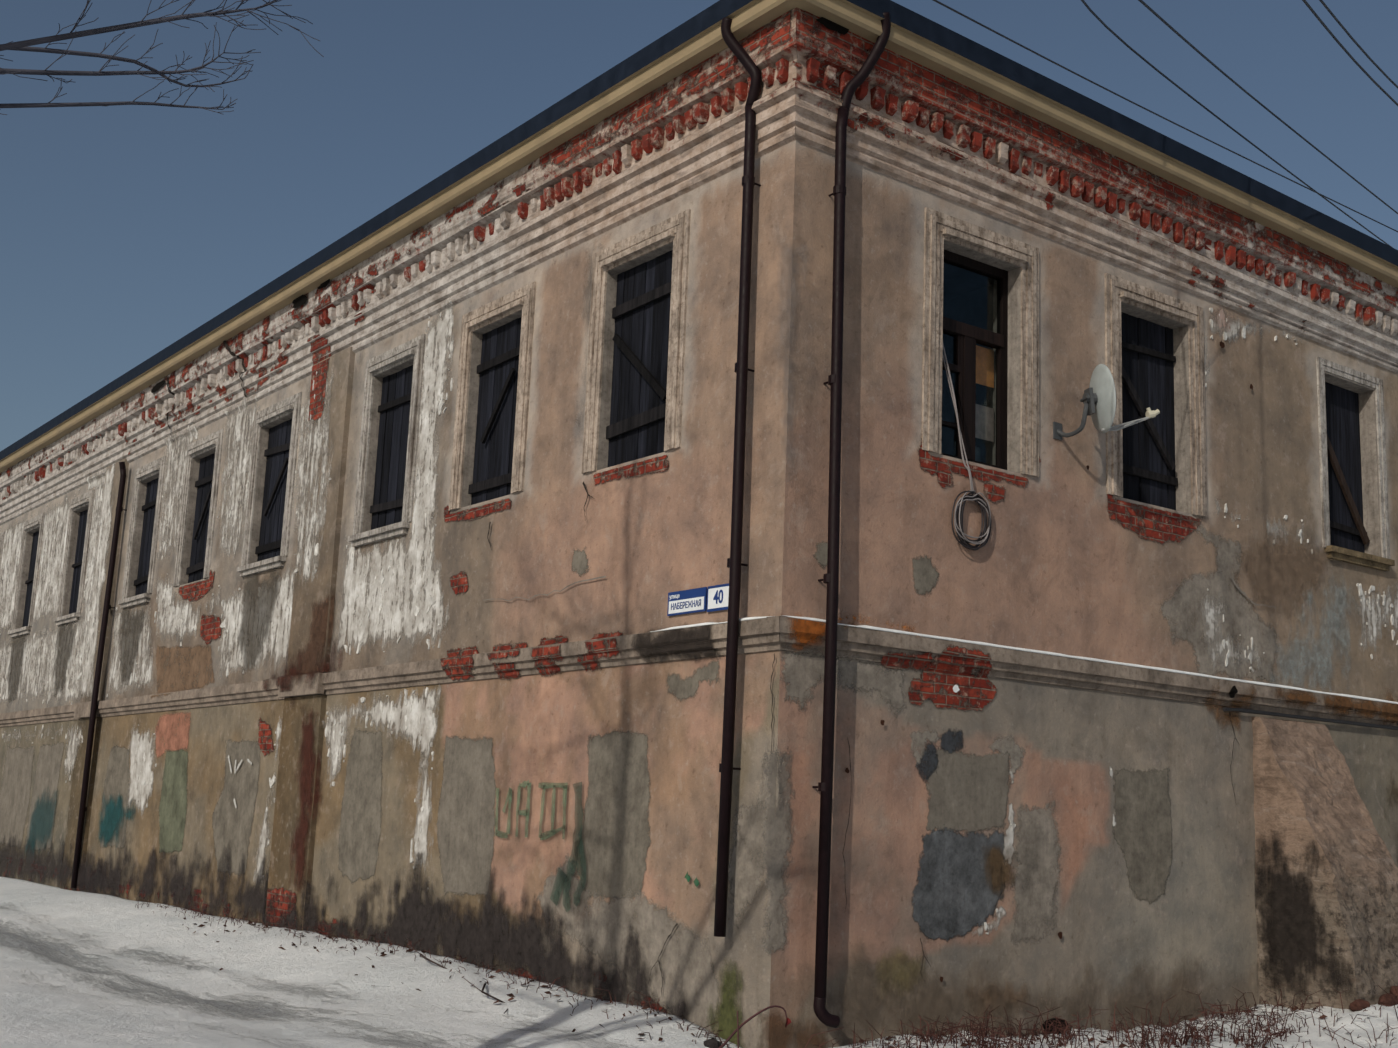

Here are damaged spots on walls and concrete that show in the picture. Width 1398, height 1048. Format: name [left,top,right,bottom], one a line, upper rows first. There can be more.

peeling [0,10,1398,711]
peeling [322,289,623,869]
peeling [2,725,83,783]
peeling [128,725,157,815]
leakage [0,795,687,1019]
peeling [974,906,1006,935]
peeling [1003,803,1016,865]
leakage [1254,838,1352,995]